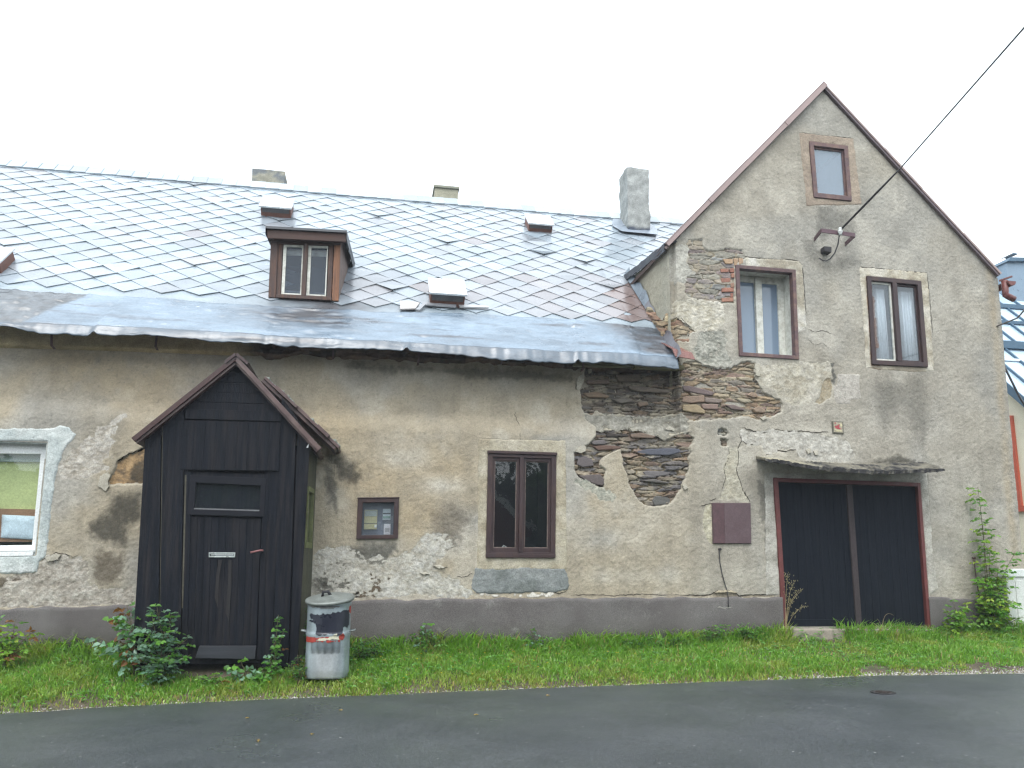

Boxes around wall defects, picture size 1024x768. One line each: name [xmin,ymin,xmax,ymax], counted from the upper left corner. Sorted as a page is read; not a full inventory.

flaking render [574,239,855,545]
flaking render [58,413,145,491]
damp [90,462,144,545]
damp [327,455,360,500]
crack [701,427,825,530]
flaking render [311,532,476,599]